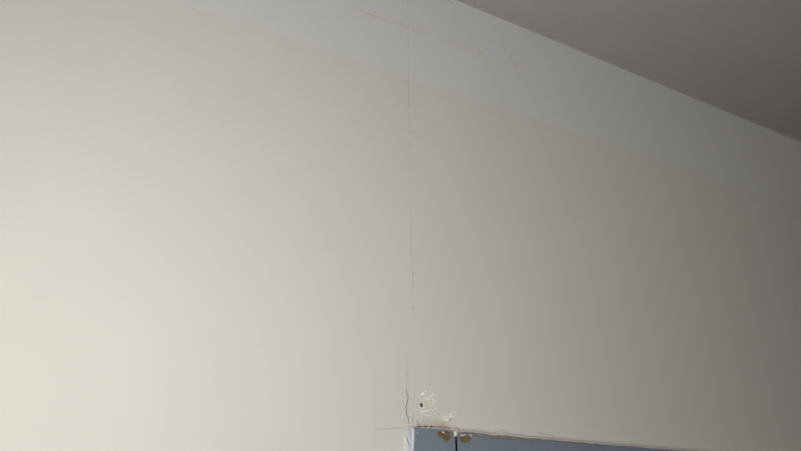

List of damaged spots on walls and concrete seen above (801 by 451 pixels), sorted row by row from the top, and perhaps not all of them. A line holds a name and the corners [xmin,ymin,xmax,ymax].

rust [430,427,471,442]